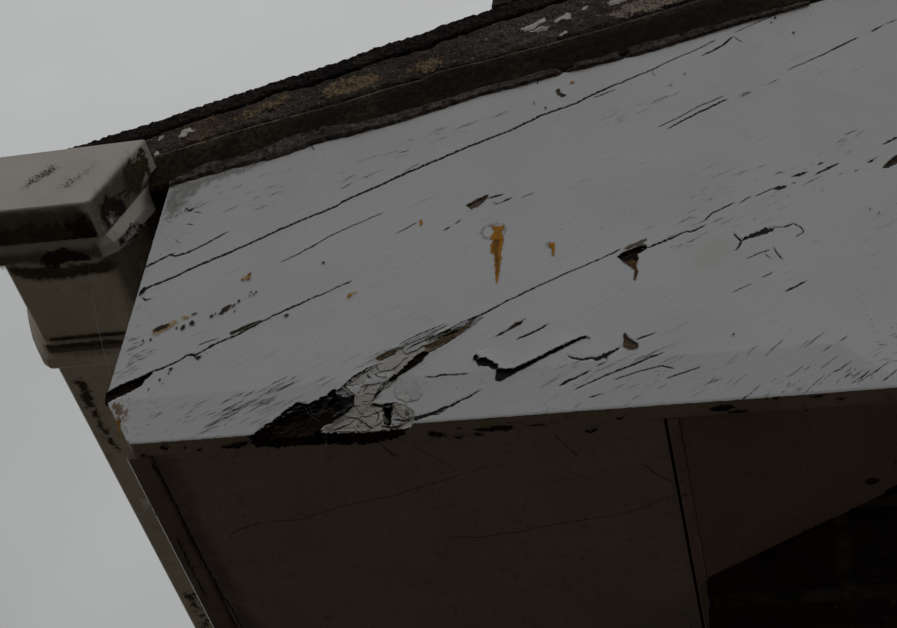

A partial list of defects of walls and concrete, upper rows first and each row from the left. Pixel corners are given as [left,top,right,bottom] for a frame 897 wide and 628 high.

crack [137,15,897,318]
mould [0,191,126,281]
mould [119,222,146,247]
rust [480,222,507,283]
peeling [617,238,647,280]
water stain [73,378,128,452]
peeling [105,371,153,406]
peeling [336,339,427,432]
peeling [473,318,590,381]
peeling [623,333,639,349]
crack [543,331,897,411]